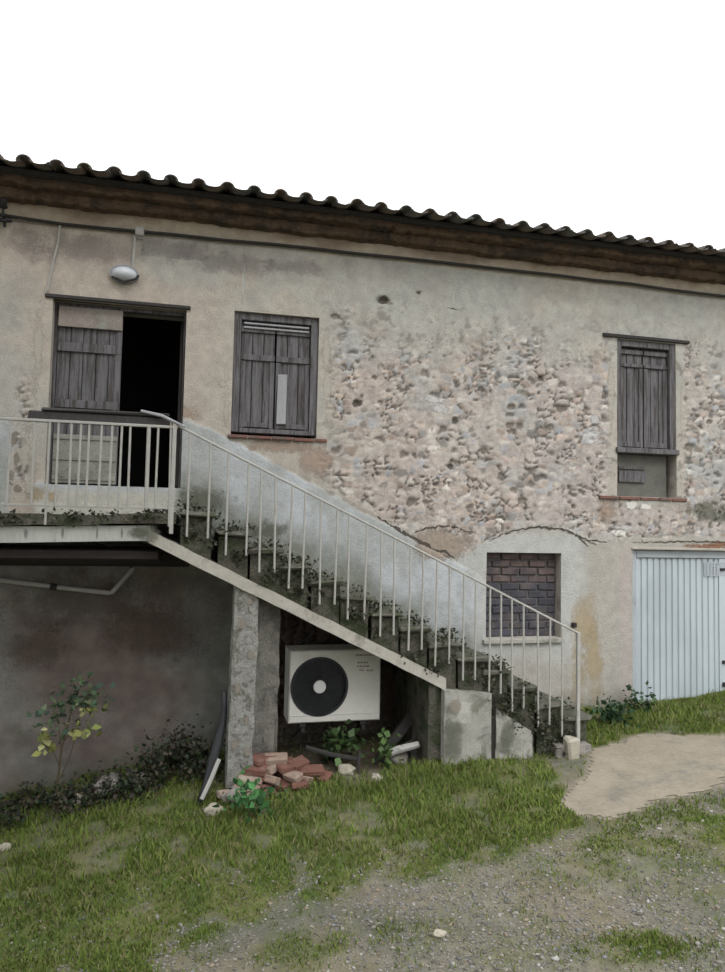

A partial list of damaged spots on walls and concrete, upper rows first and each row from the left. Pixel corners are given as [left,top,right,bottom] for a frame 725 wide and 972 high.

peeling [423,397,458,424]
peeling [581,364,615,445]
flaking render [598,500,638,537]
peeling [624,500,654,510]
crack [378,516,607,559]
crack [633,537,725,545]